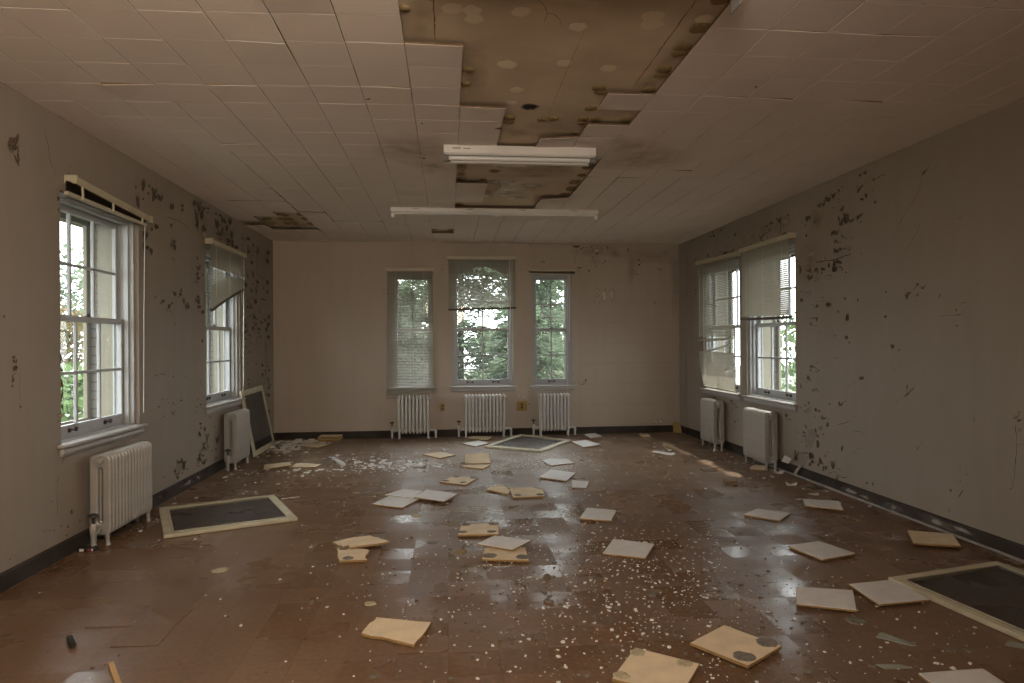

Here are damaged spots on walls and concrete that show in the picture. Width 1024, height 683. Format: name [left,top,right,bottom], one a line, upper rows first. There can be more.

peeling [7,134,20,166]
peeling [135,179,271,397]
peeling [775,362,847,480]